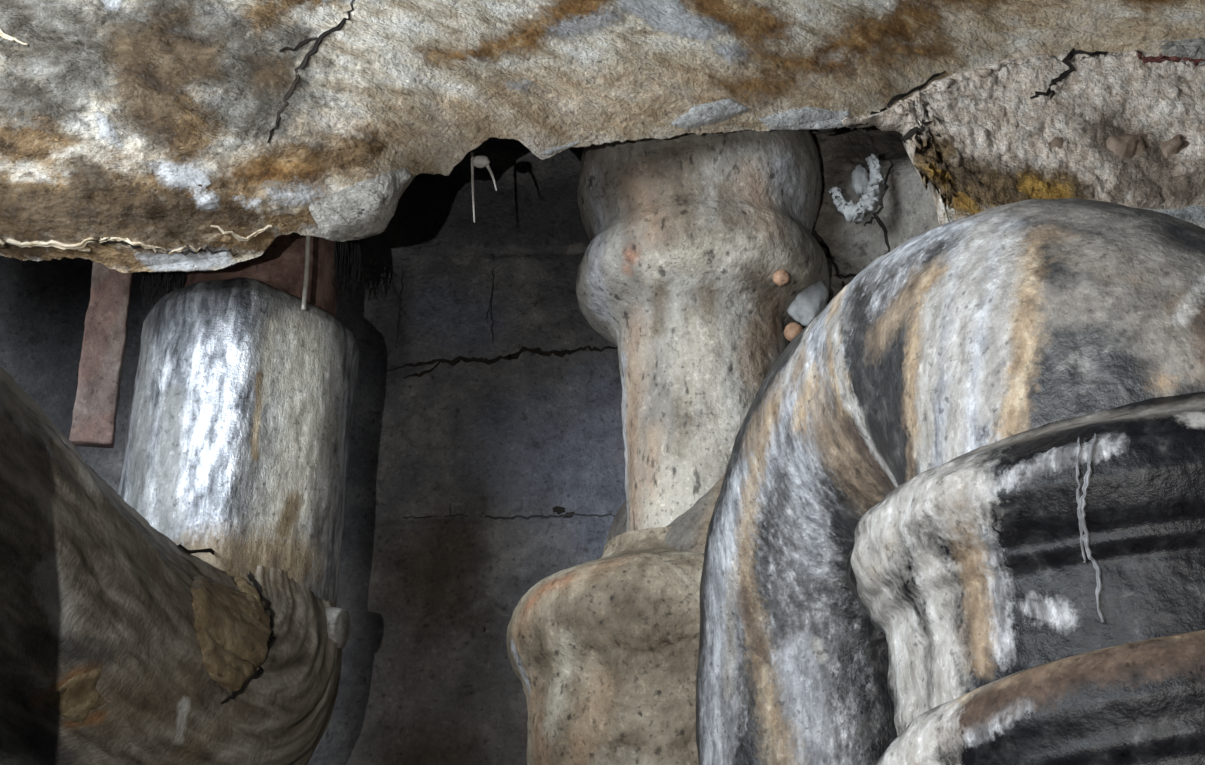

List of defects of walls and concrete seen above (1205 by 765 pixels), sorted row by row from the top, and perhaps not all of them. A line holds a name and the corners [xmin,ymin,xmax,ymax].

rust [415,0,614,65]
rust [1123,0,1176,11]
crack [267,0,356,143]
crack [1030,48,1112,99]
rust [232,151,324,192]
crack [385,266,618,379]